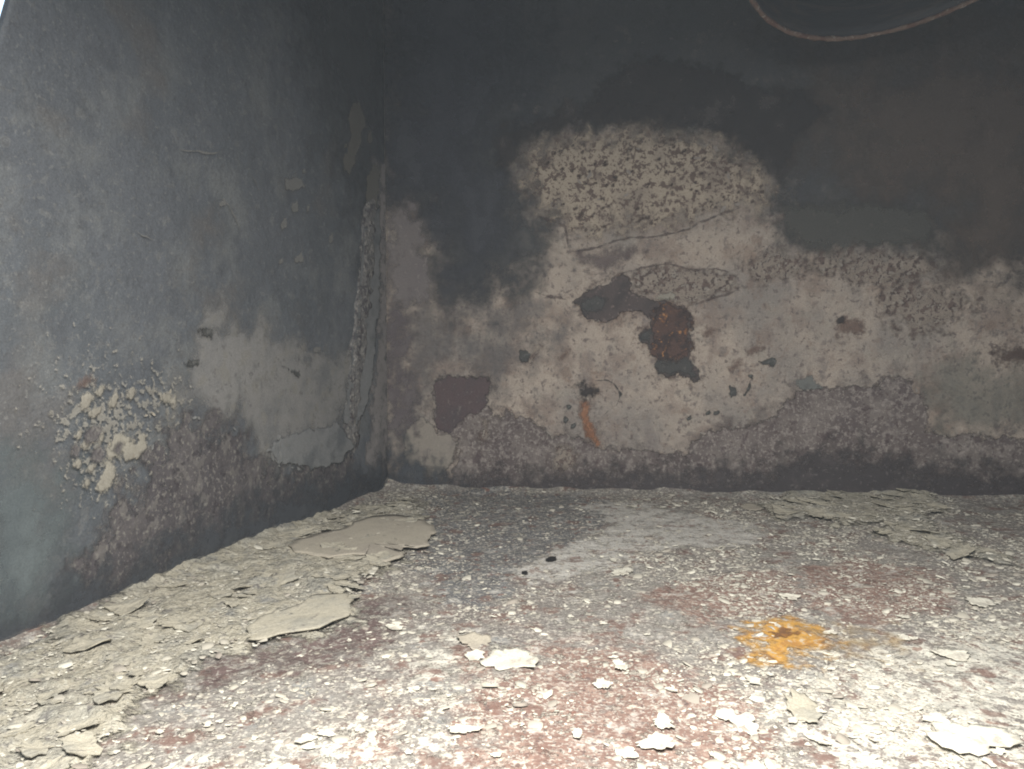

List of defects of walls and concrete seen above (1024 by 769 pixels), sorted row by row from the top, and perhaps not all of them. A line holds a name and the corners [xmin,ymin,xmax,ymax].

damp [493,56,825,180]
damp [576,247,647,270]
crack [545,210,731,251]
peeling [574,273,700,383]
rust [577,380,600,446]
peeling [404,374,1024,567]
peeling [0,294,429,769]
rust [731,615,847,669]